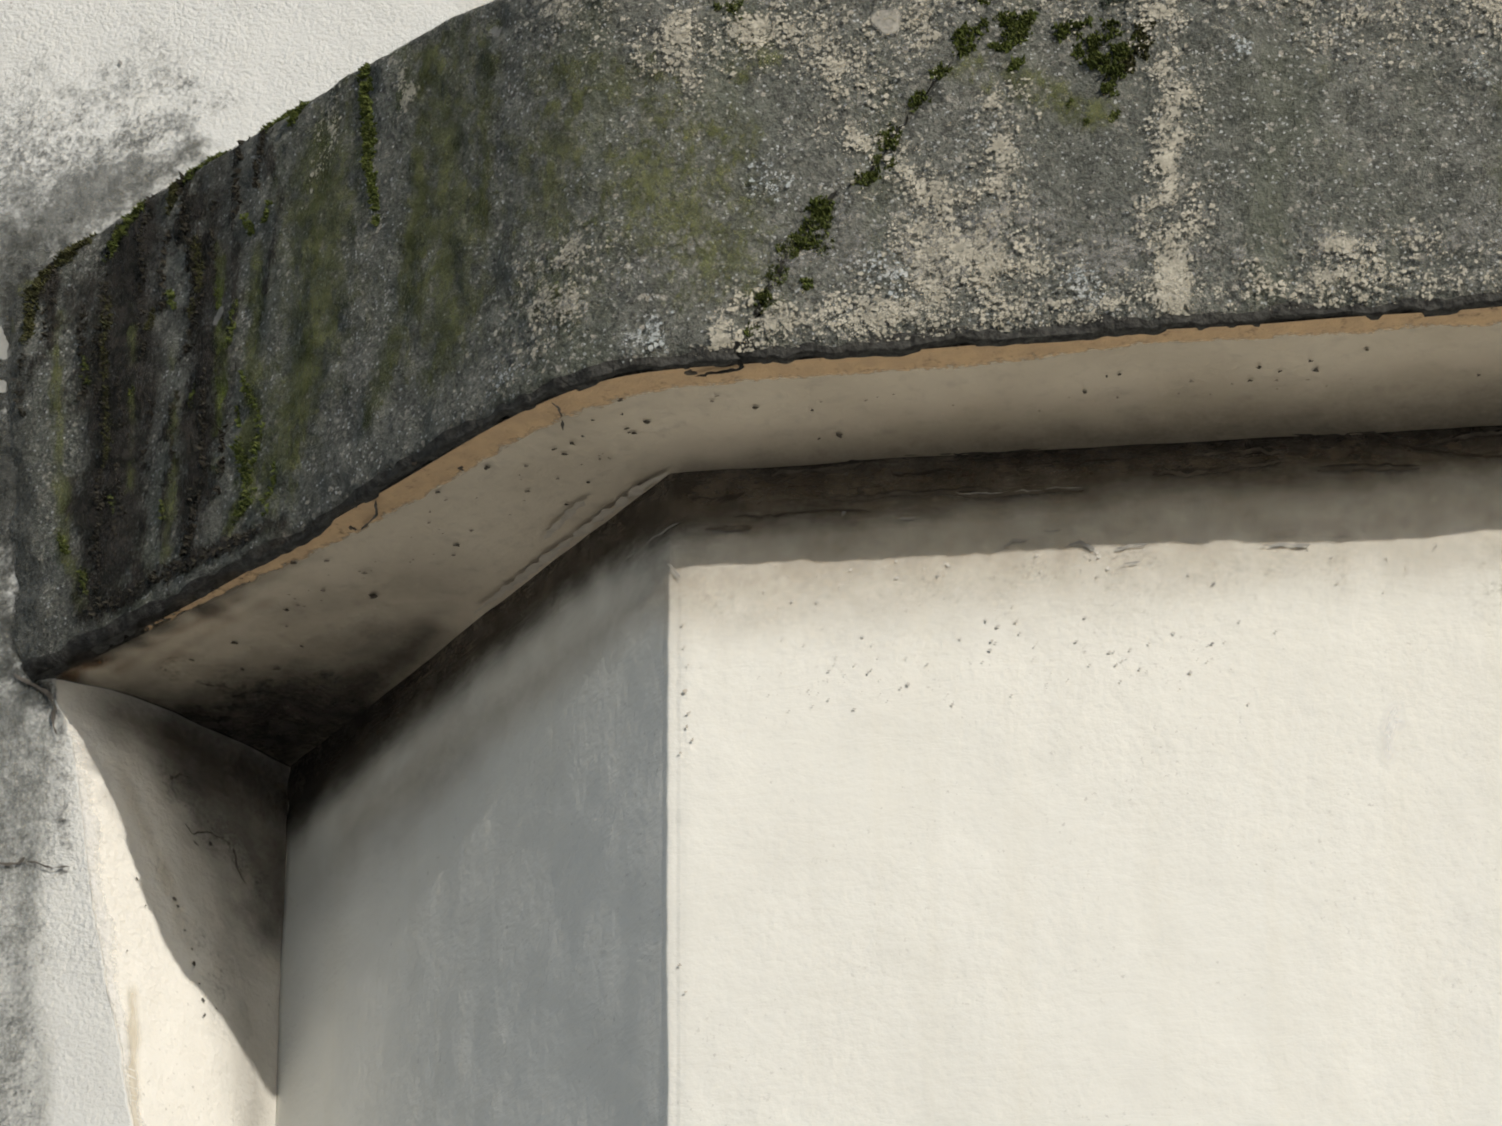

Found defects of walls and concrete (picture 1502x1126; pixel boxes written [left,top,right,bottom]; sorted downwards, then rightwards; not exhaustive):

leakage [5,128,286,661]
leakage [493,219,628,352]
leakage [605,0,1502,353]
leakage [0,705,68,934]
leakage [151,634,428,913]